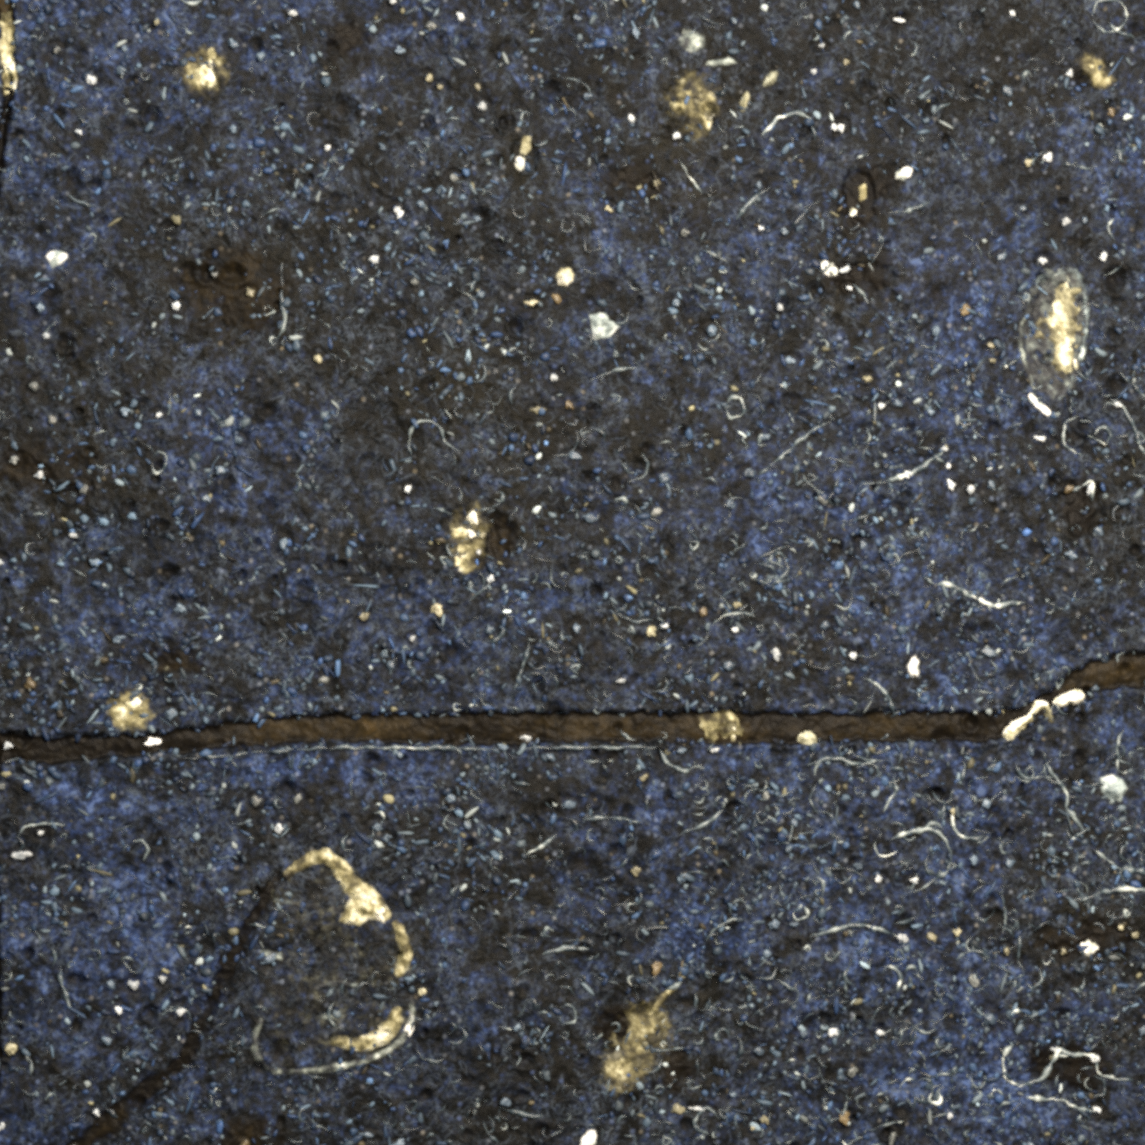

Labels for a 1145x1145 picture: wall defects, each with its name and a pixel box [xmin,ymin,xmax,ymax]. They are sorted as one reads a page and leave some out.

crack [0,0,15,174]
crack [0,651,1145,771]
crack [0,959,8,1062]
crack [67,874,284,1145]